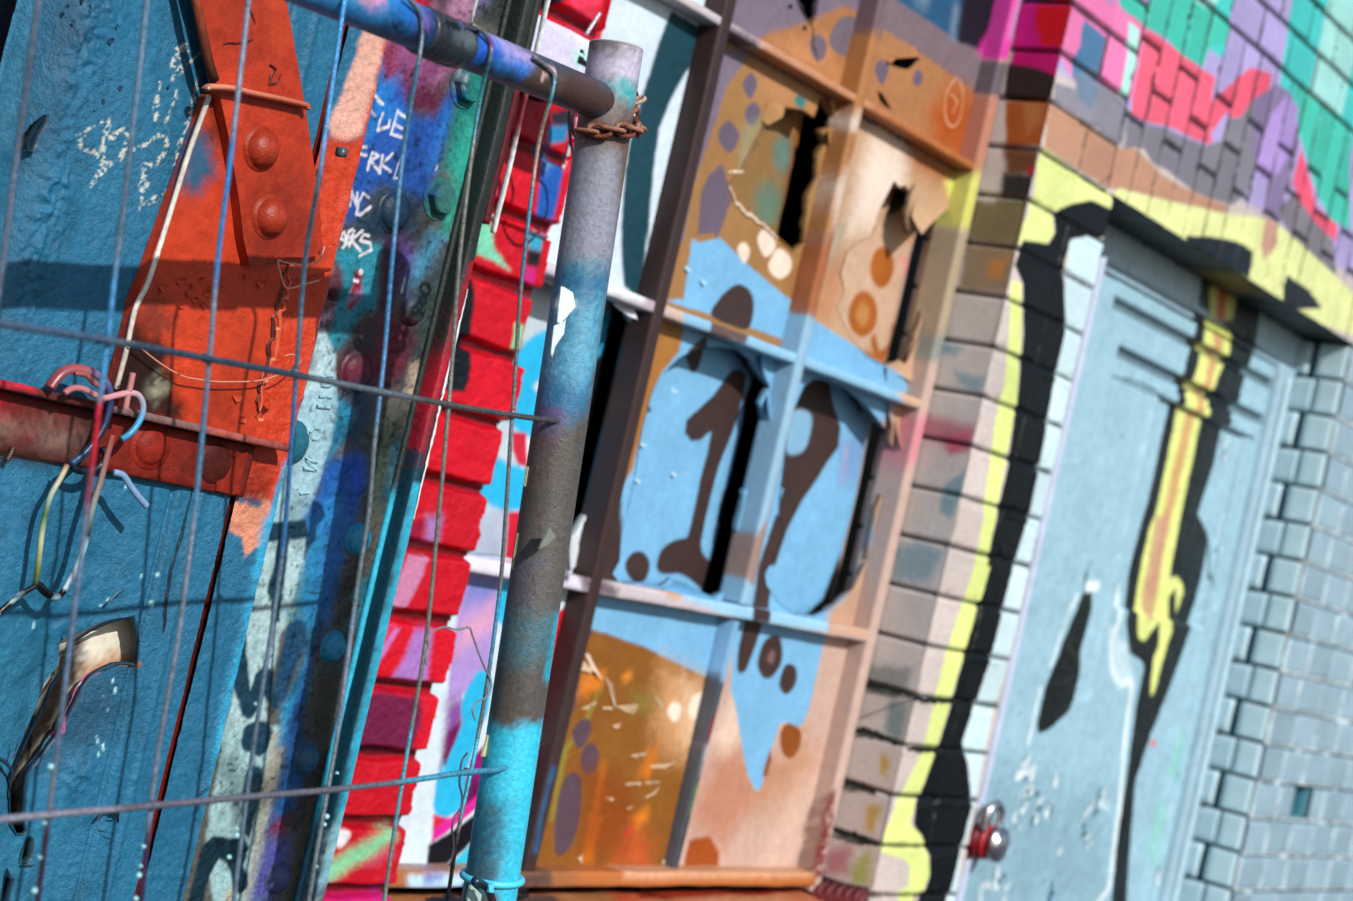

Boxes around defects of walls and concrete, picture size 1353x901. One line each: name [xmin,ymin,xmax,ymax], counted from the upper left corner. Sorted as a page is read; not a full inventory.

peeling [94,812,119,840]